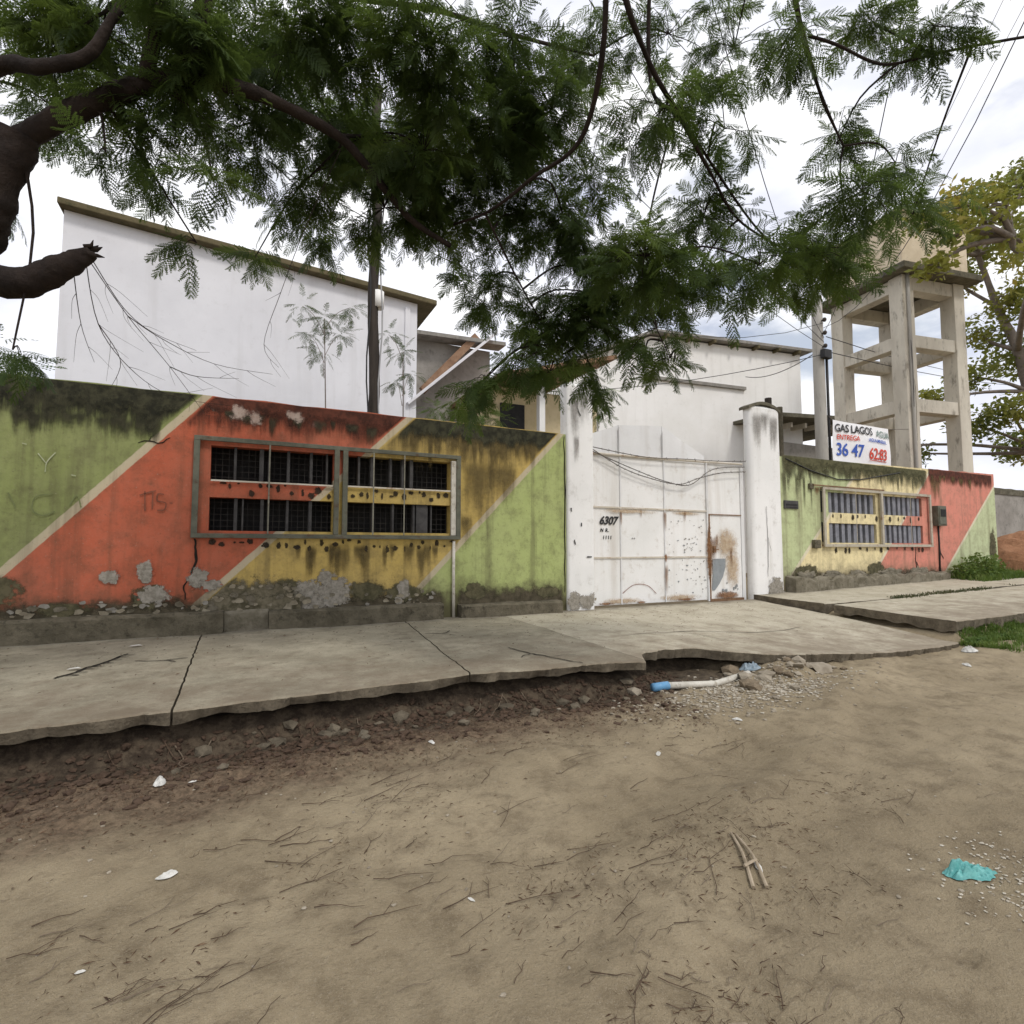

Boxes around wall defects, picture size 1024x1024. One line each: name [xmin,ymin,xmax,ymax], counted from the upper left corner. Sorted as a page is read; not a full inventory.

water stain [0,375,195,438]
water stain [782,455,991,498]
flaking render [6,560,369,619]
crack [183,539,198,600]
water stain [208,538,454,570]
water stain [303,581,443,609]
corrosion [707,527,738,598]
crack [55,653,188,678]